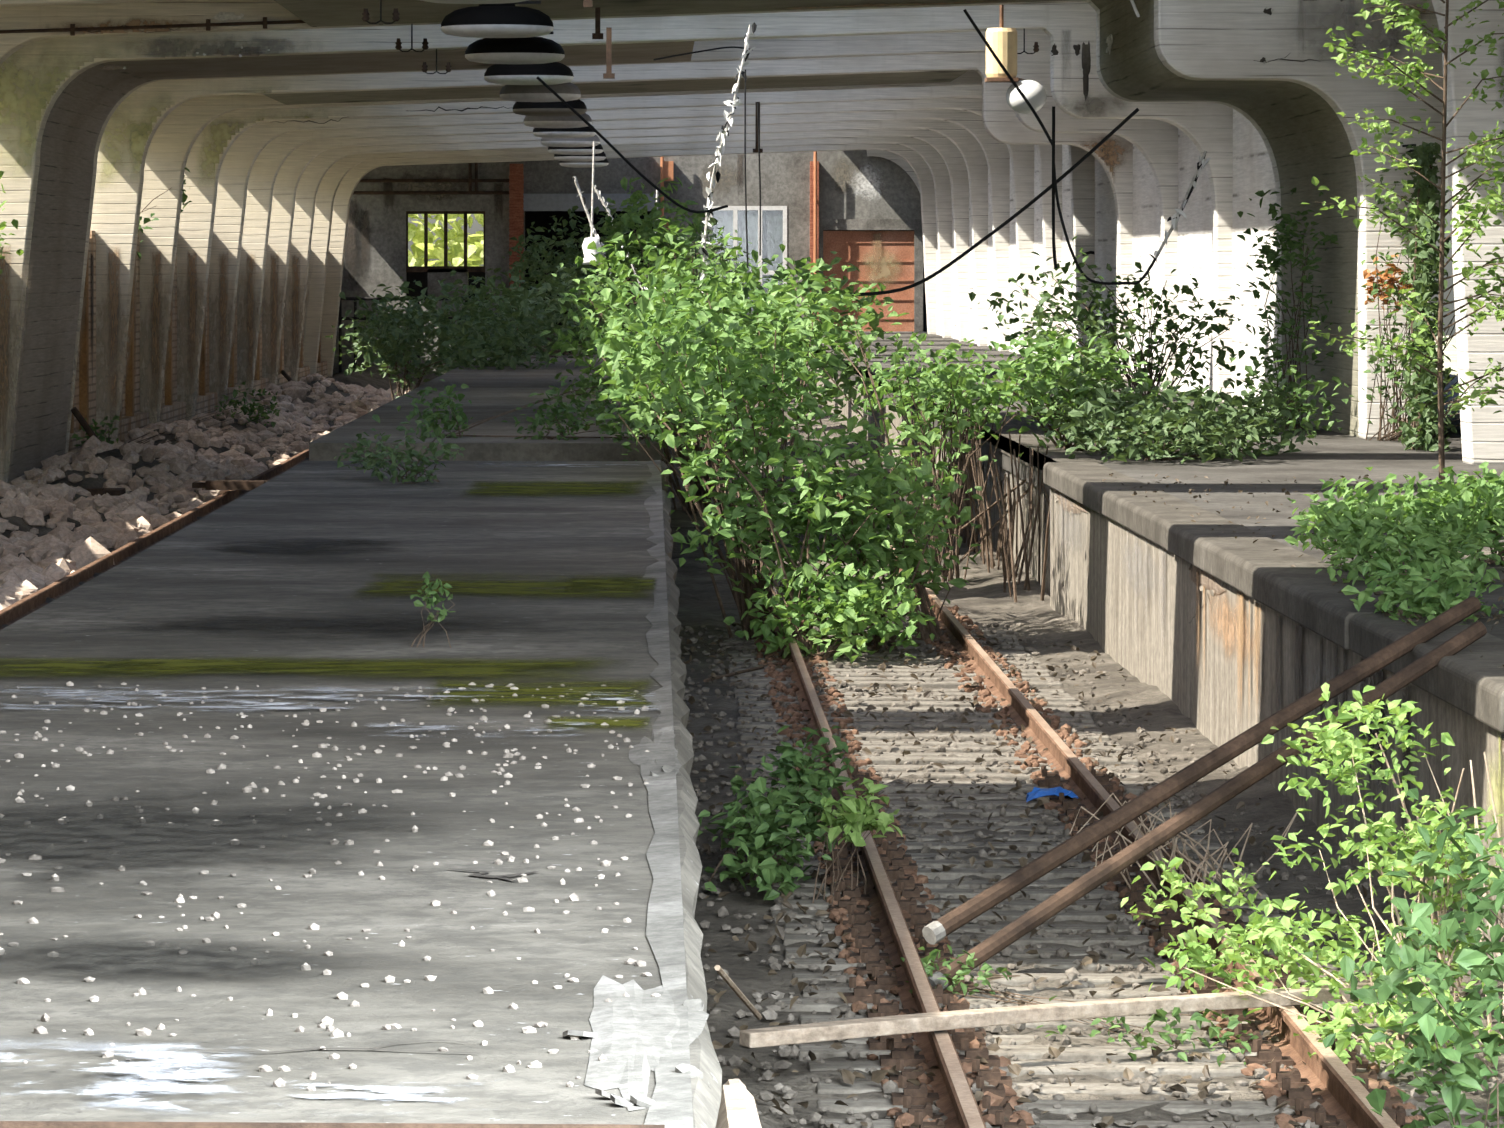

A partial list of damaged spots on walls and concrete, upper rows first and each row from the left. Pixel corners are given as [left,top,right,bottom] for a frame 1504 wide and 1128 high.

spalling [563,975,709,1111]